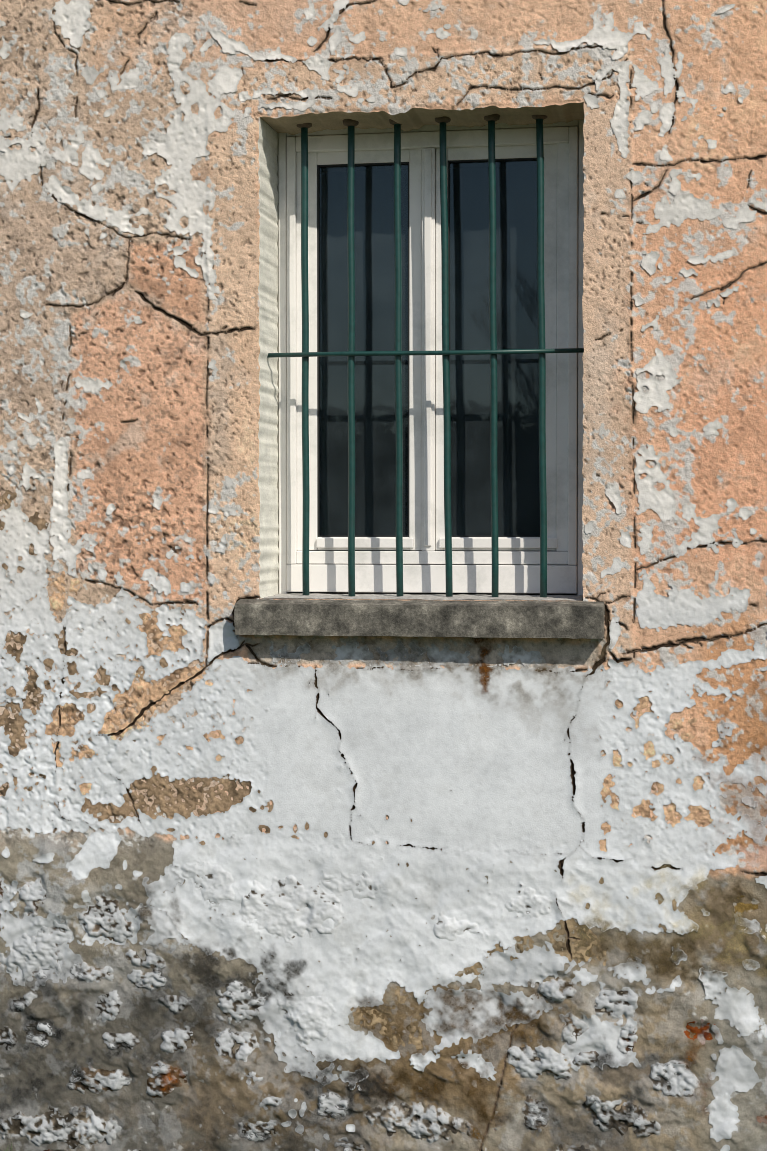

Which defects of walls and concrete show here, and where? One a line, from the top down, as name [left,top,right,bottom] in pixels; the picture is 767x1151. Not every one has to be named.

peeling [142,0,407,300]
crack [241,0,632,123]
peeling [534,10,767,234]
crack [662,0,679,134]
crack [40,166,373,845]
crack [536,155,767,959]
peeling [0,398,767,1091]
rust [474,638,490,691]
water stain [181,948,306,1003]
water stain [307,1065,408,1126]
water stain [438,989,546,1042]
peeling [698,968,767,1151]